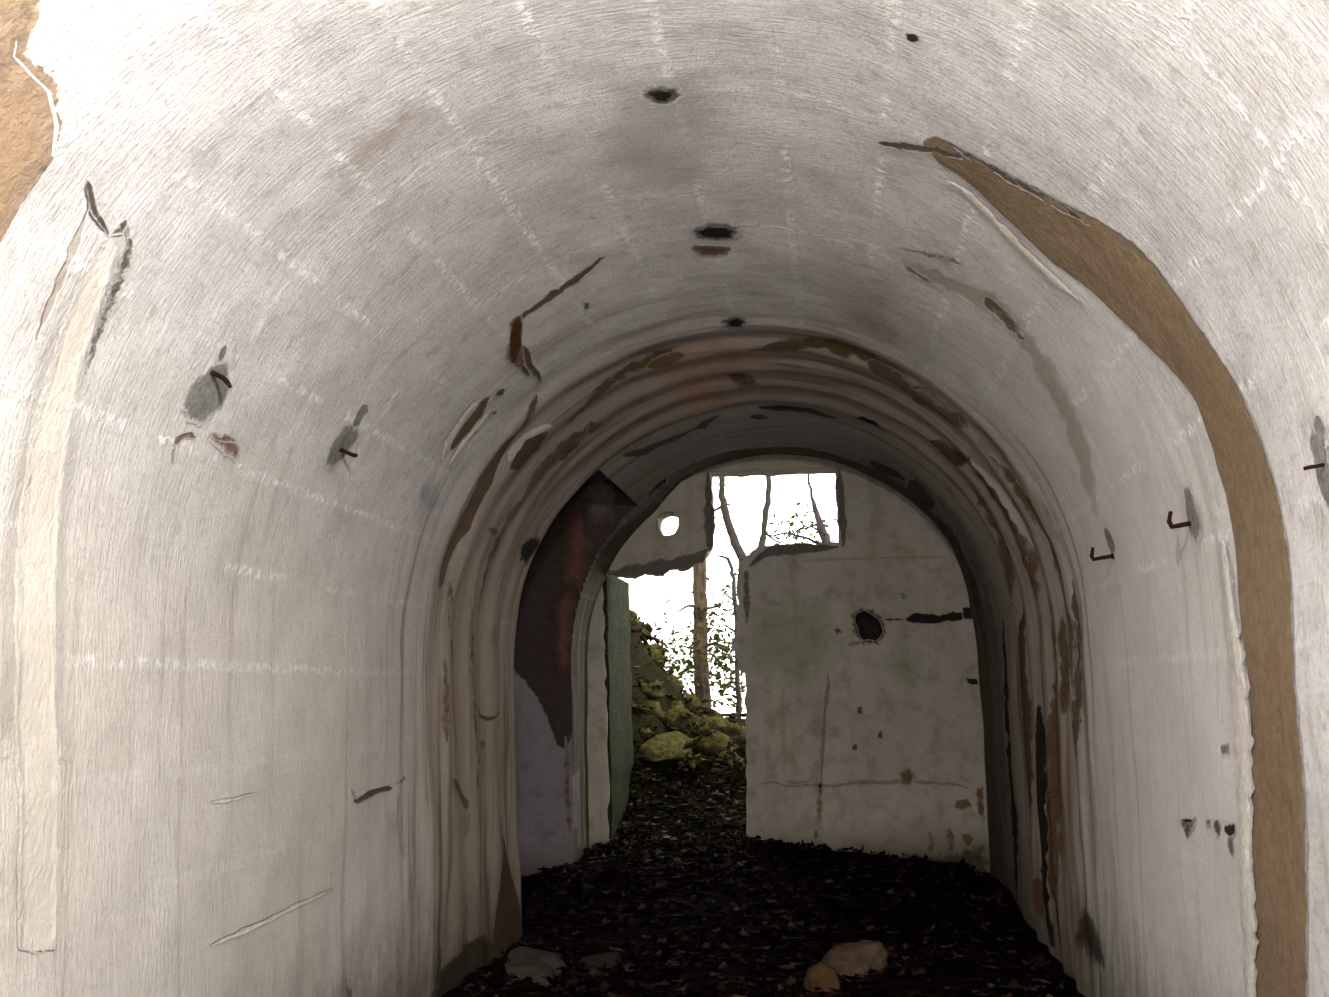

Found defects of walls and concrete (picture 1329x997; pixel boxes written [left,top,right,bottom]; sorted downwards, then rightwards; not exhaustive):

spalling [0,0,63,242]
crack [505,256,607,382]
corrosion [548,479,628,681]
crack [622,405,1060,948]
spalling [878,136,1308,997]